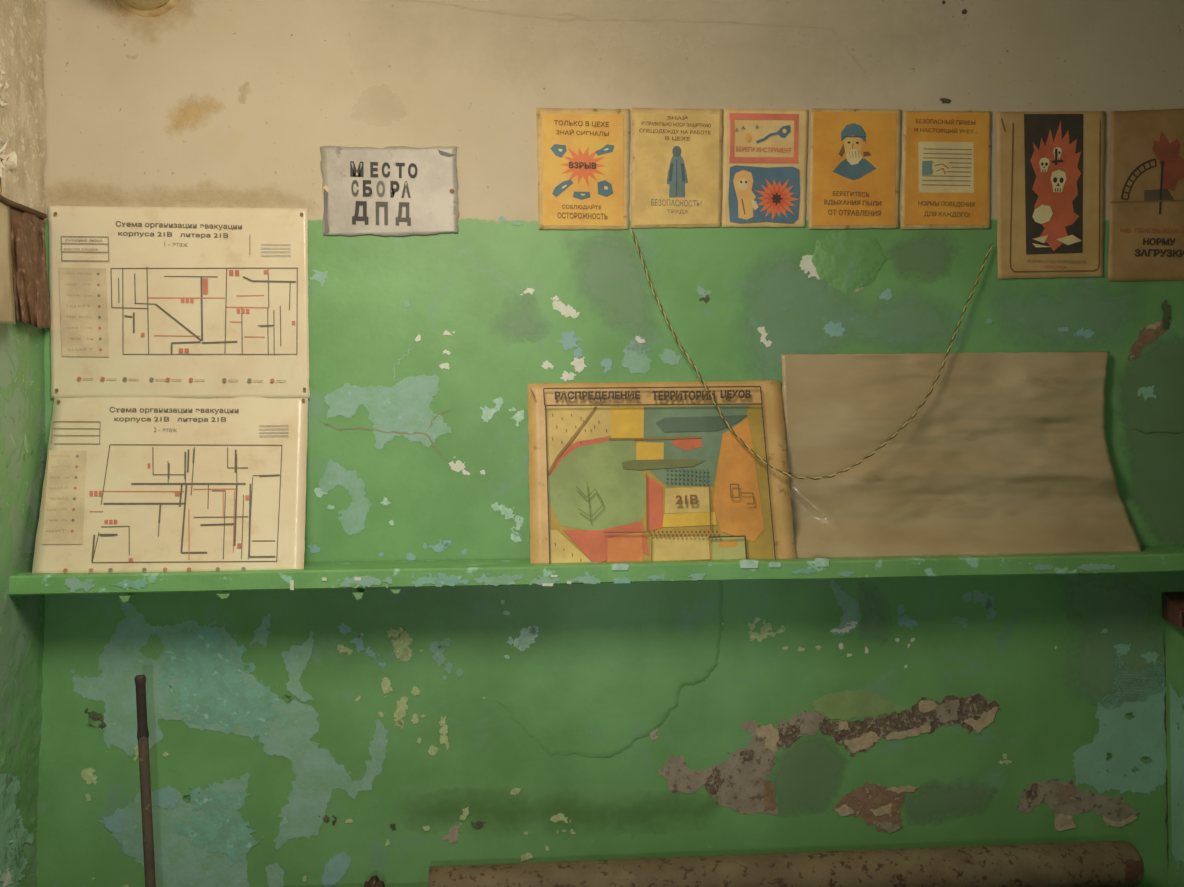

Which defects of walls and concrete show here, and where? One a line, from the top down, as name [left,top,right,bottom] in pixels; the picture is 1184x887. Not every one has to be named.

peeling [0,0,46,222]
spalling [1127,300,1171,363]
peeling [0,772,33,887]
peeling [70,599,463,887]
peeling [550,813,576,834]
spalling [658,689,1000,816]
spalling [833,781,920,833]